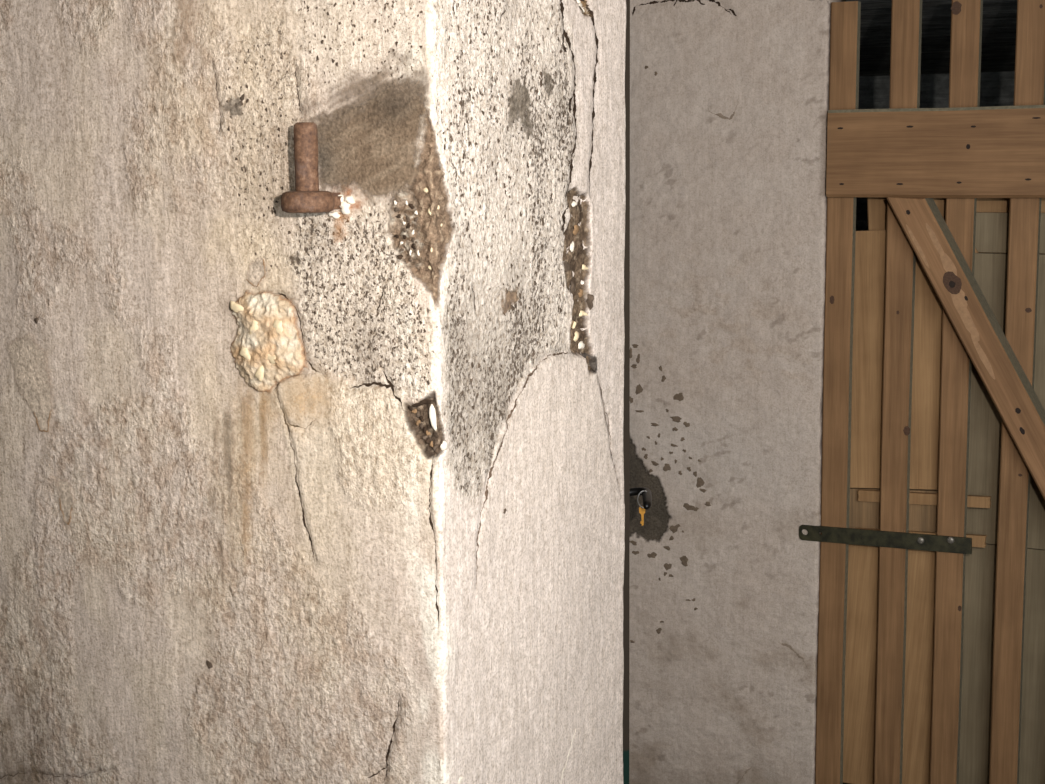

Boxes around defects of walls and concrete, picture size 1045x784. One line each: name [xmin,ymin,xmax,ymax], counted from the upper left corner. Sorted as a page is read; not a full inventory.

peeling [311,73,454,304]
peeling [502,288,519,314]
peeling [508,71,553,139]
spalling [562,187,594,373]
crack [272,293,324,561]
spalling [405,393,447,458]
crack [476,352,570,585]
crack [597,376,618,480]